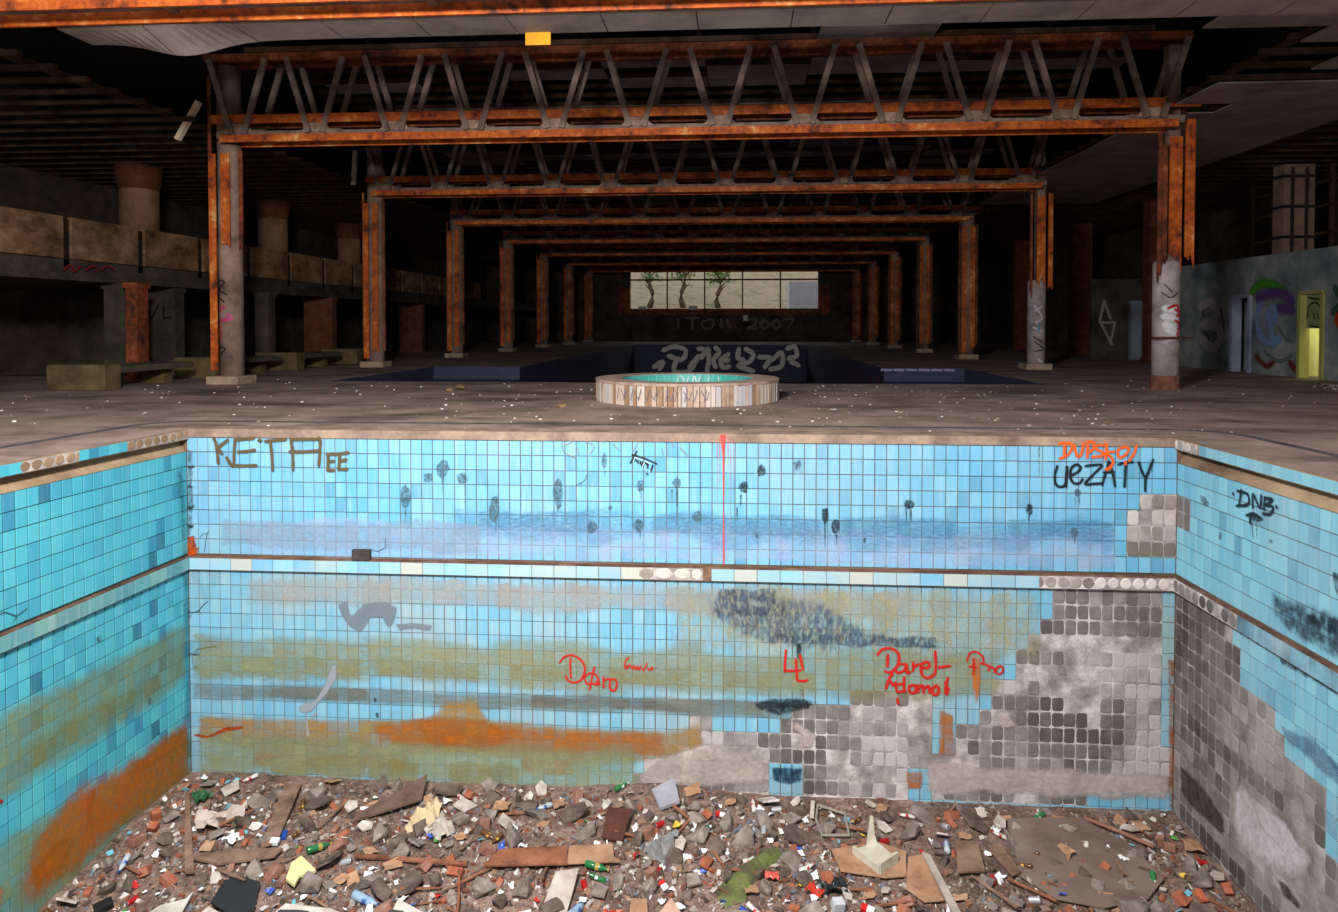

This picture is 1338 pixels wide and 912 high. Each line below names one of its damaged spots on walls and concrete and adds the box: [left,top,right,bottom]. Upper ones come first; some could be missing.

water stain [253,579,650,611]
spalling [639,567,703,581]
water stain [1274,595,1338,655]
water stain [0,588,1030,792]
spalling [633,576,1338,912]
rust [27,702,701,897]
water stain [0,807,146,912]